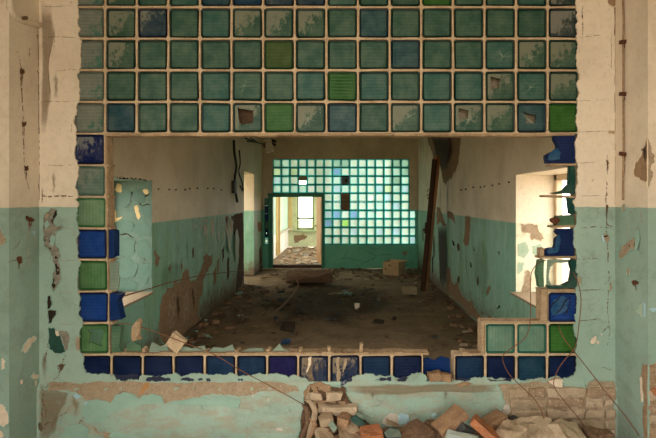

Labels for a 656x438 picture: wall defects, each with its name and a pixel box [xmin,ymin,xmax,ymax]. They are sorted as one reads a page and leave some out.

flaking render [633,138,655,187]
peeling [42,208,80,354]
flaking render [158,212,244,345]
flaking render [518,223,544,292]
flaking render [600,230,640,260]
peeling [48,373,410,438]
flaking render [487,375,618,438]